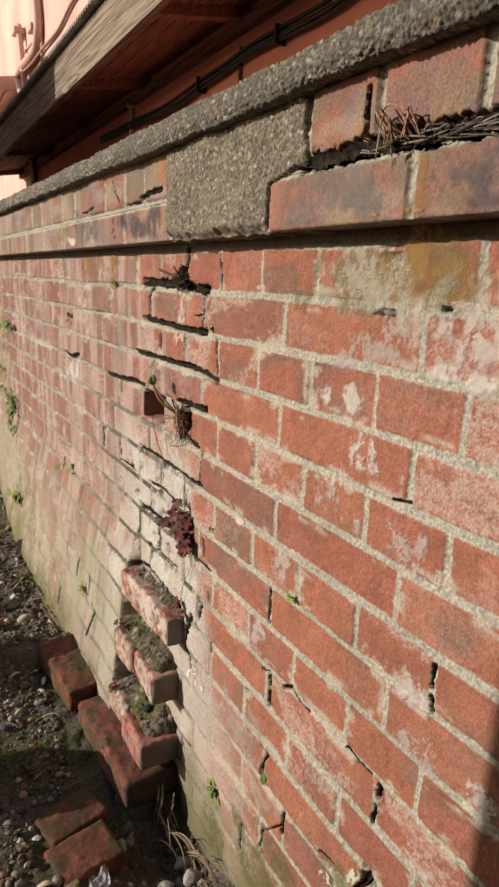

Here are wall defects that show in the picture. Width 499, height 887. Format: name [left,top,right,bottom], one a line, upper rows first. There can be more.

crack [108,279,220,390]
leakage [306,248,419,368]
leakage [425,237,499,394]
crack [182,400,208,411]
leakage [343,383,360,414]
leakage [350,432,378,474]
spalling [135,565,179,611]
spalling [125,614,203,691]
spalling [121,674,177,738]
crack [348,746,373,775]
crack [240,812,286,847]
leakage [232,809,294,887]